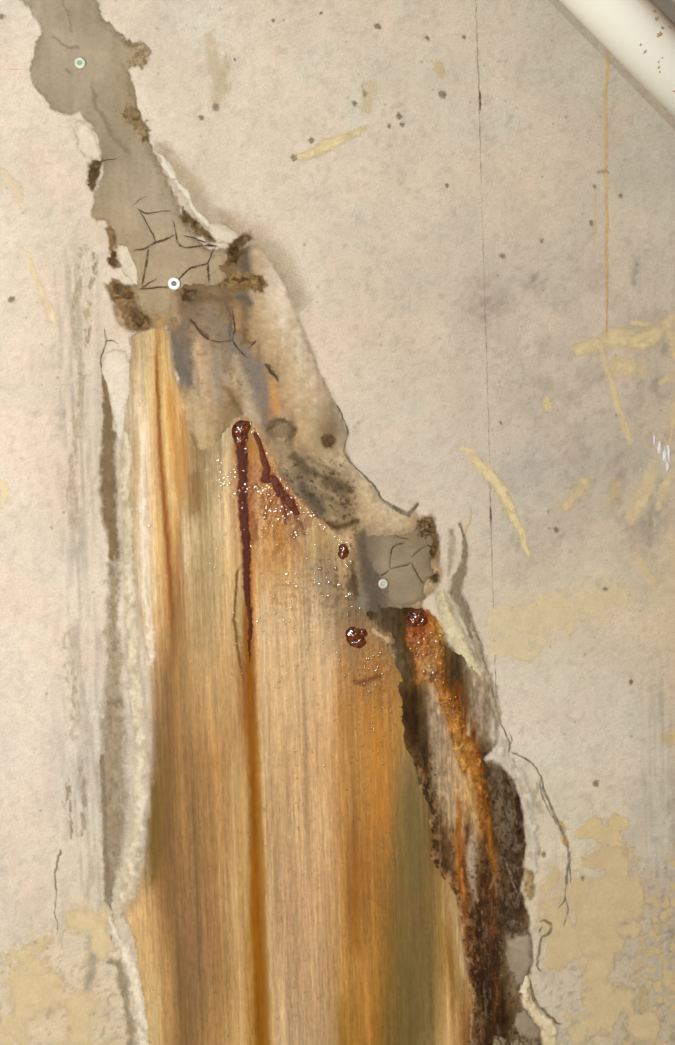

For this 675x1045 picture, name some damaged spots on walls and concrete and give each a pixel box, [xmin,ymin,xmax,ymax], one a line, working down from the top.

spalling [124,39,151,70]
peeling [74,120,103,192]
spalling [115,103,150,143]
spalling [104,226,153,332]
crack [133,198,218,290]
spalling [156,152,268,295]
peeling [101,349,131,440]
crack [335,404,428,583]
spalling [415,517,440,584]
corrosion [116,327,498,1045]
crack [461,598,572,1045]
peeling [519,974,560,1045]